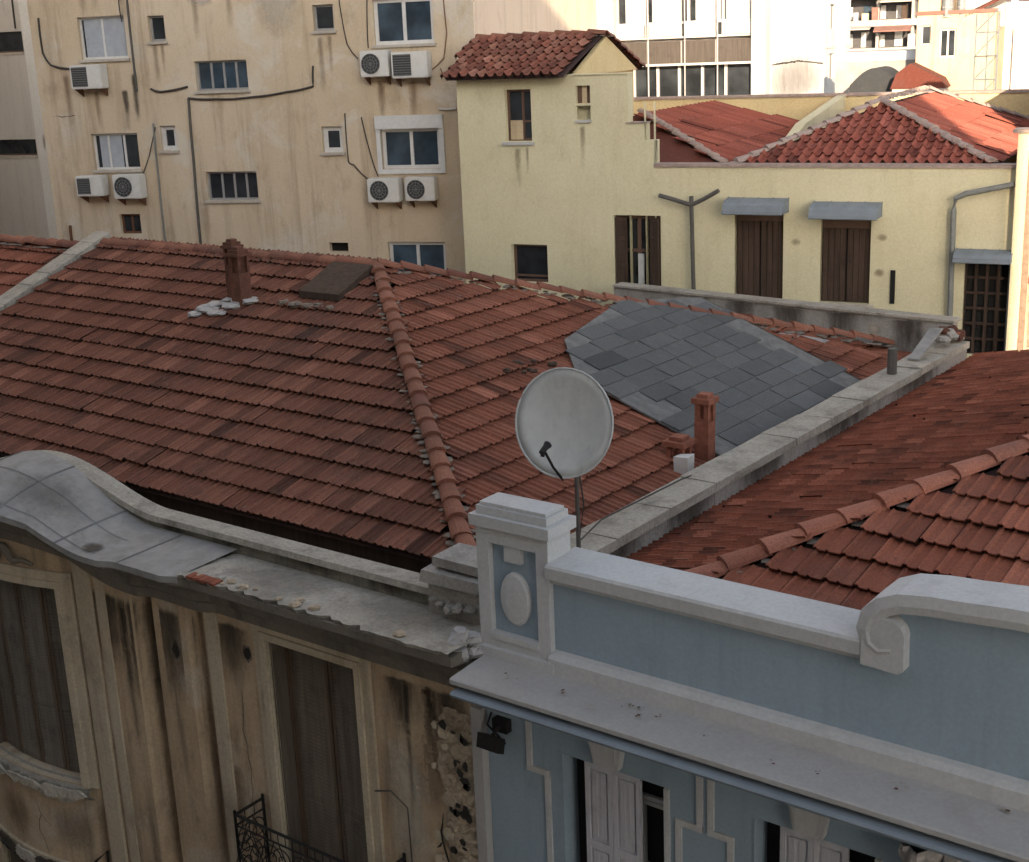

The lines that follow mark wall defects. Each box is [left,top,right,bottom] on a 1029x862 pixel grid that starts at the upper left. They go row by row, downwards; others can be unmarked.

spalling [1017,159,1029,351]